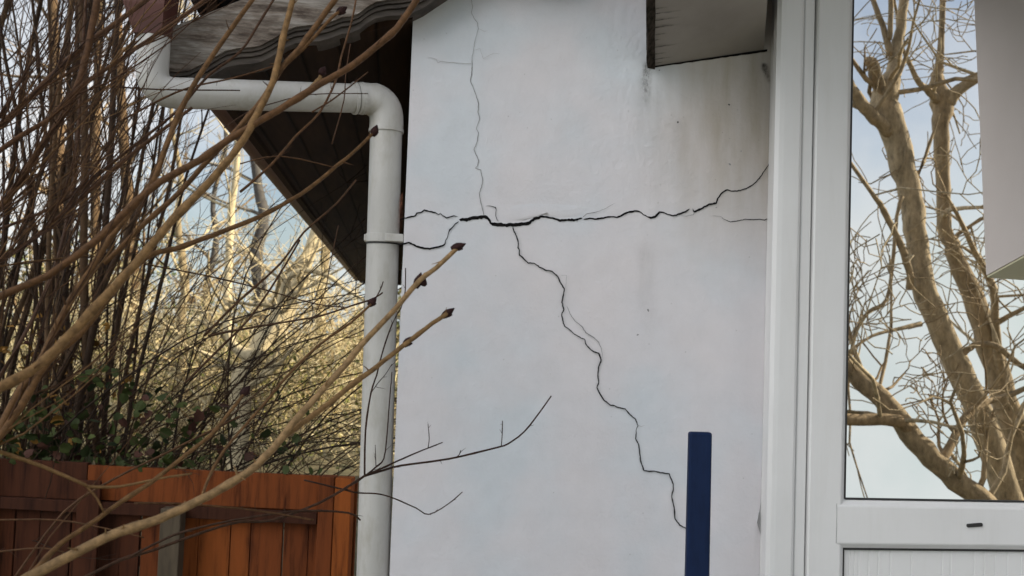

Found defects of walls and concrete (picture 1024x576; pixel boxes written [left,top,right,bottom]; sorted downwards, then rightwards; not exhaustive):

crack [399,0,769,529]